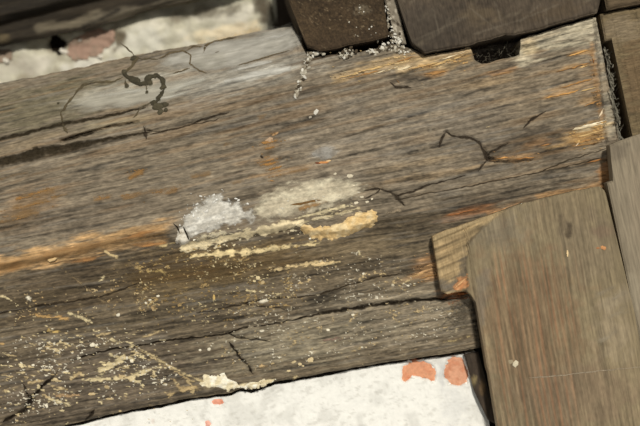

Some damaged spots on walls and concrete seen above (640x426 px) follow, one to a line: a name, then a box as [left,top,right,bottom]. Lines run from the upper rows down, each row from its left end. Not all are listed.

crack [360,132,606,206]
leakage [0,239,118,274]
leakage [142,195,378,279]
crack [70,273,469,374]